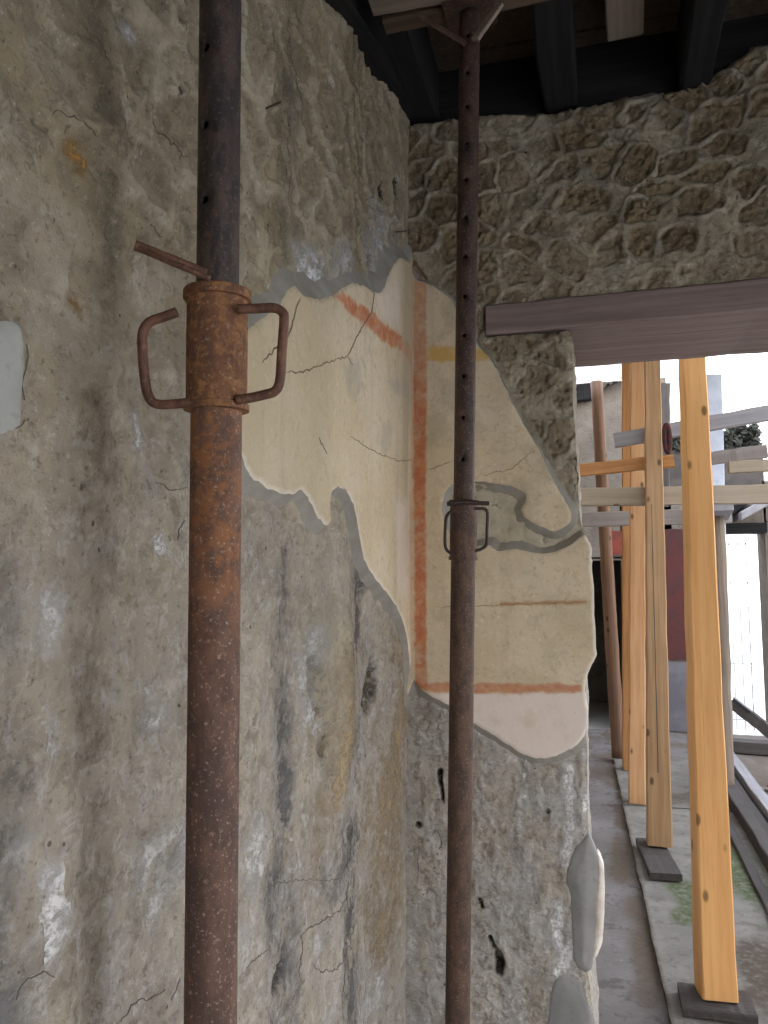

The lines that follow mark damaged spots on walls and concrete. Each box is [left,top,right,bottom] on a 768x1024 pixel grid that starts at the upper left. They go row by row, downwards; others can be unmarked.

crack [262,292,375,374]
crack [350,436,453,470]
spalling [475,483,584,547]
spalling [306,656,320,712]
spalling [361,662,376,712]
crack [267,878,356,999]
spalling [489,935,505,973]
peeling [547,833,605,1024]